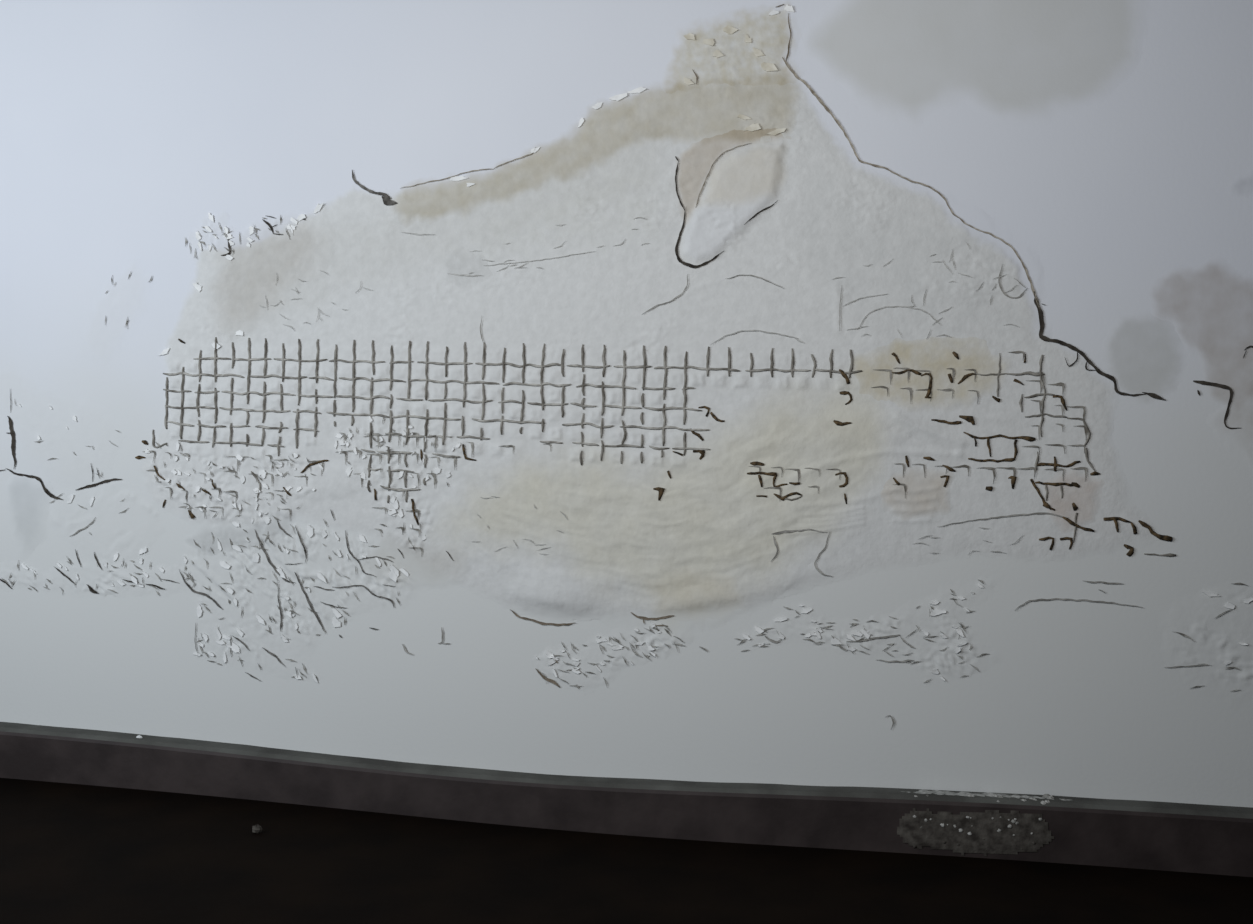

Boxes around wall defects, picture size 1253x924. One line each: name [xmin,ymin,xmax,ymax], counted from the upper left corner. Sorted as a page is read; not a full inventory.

leakage [798,0,1153,130]
crack [643,143,783,314]
crack [776,4,1165,400]
crack [0,392,122,500]
spalling [0,83,905,683]
crack [1193,380,1236,429]
spalling [732,338,1173,687]
crack [55,511,450,681]
peeling [531,610,684,697]
peeling [1157,580,1253,710]
spalling [897,789,1069,856]